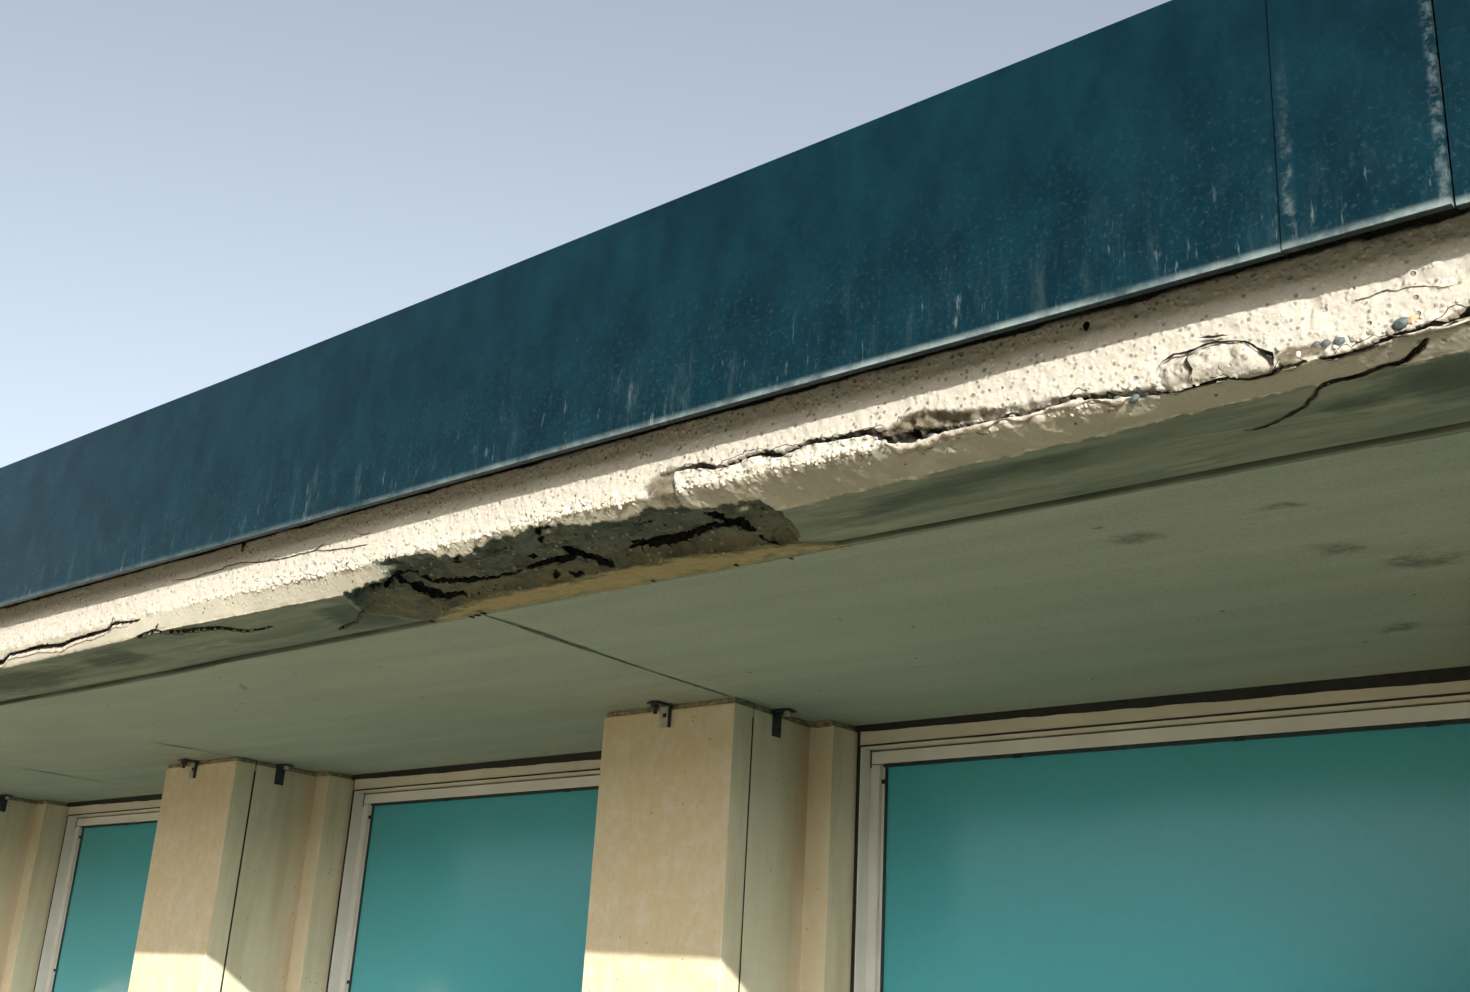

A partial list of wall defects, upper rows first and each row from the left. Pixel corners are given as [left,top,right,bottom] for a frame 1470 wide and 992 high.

peeling [1275,322,1385,359]
crack [660,284,1470,477]
peeling [1047,379,1160,418]
spalling [177,440,874,621]
crack [0,618,272,670]